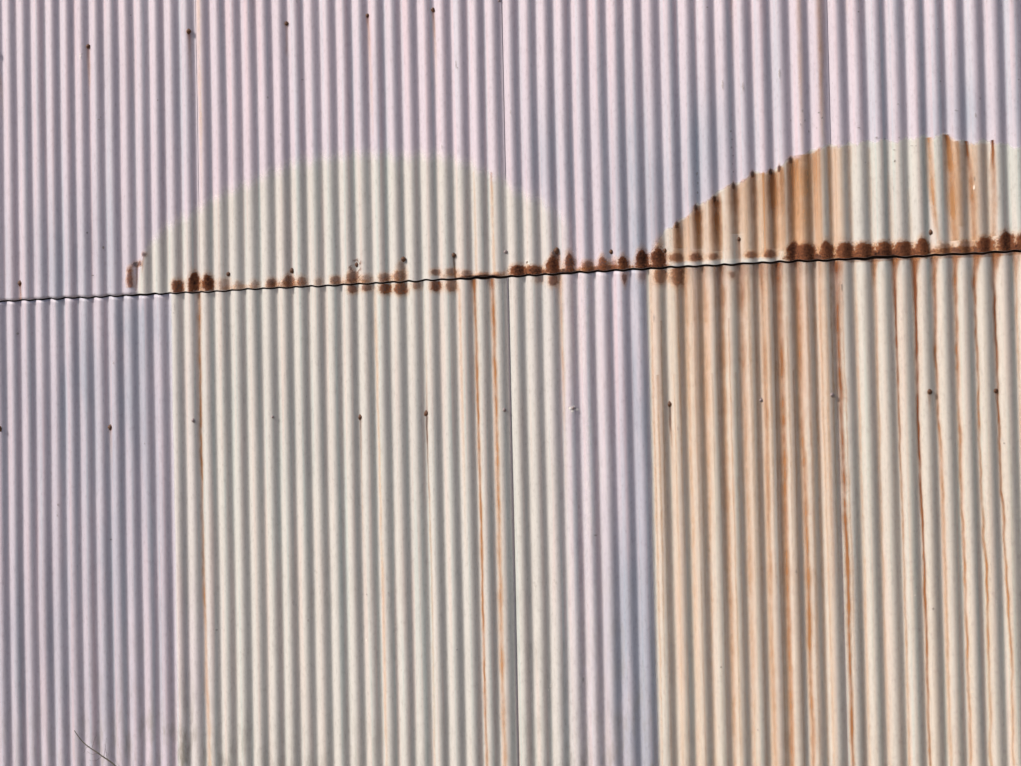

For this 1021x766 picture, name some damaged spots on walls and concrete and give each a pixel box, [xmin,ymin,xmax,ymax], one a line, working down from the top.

corrosion [126,252,145,288]
corrosion [266,275,306,288]
corrosion [330,195,733,631]
corrosion [745,134,1021,766]